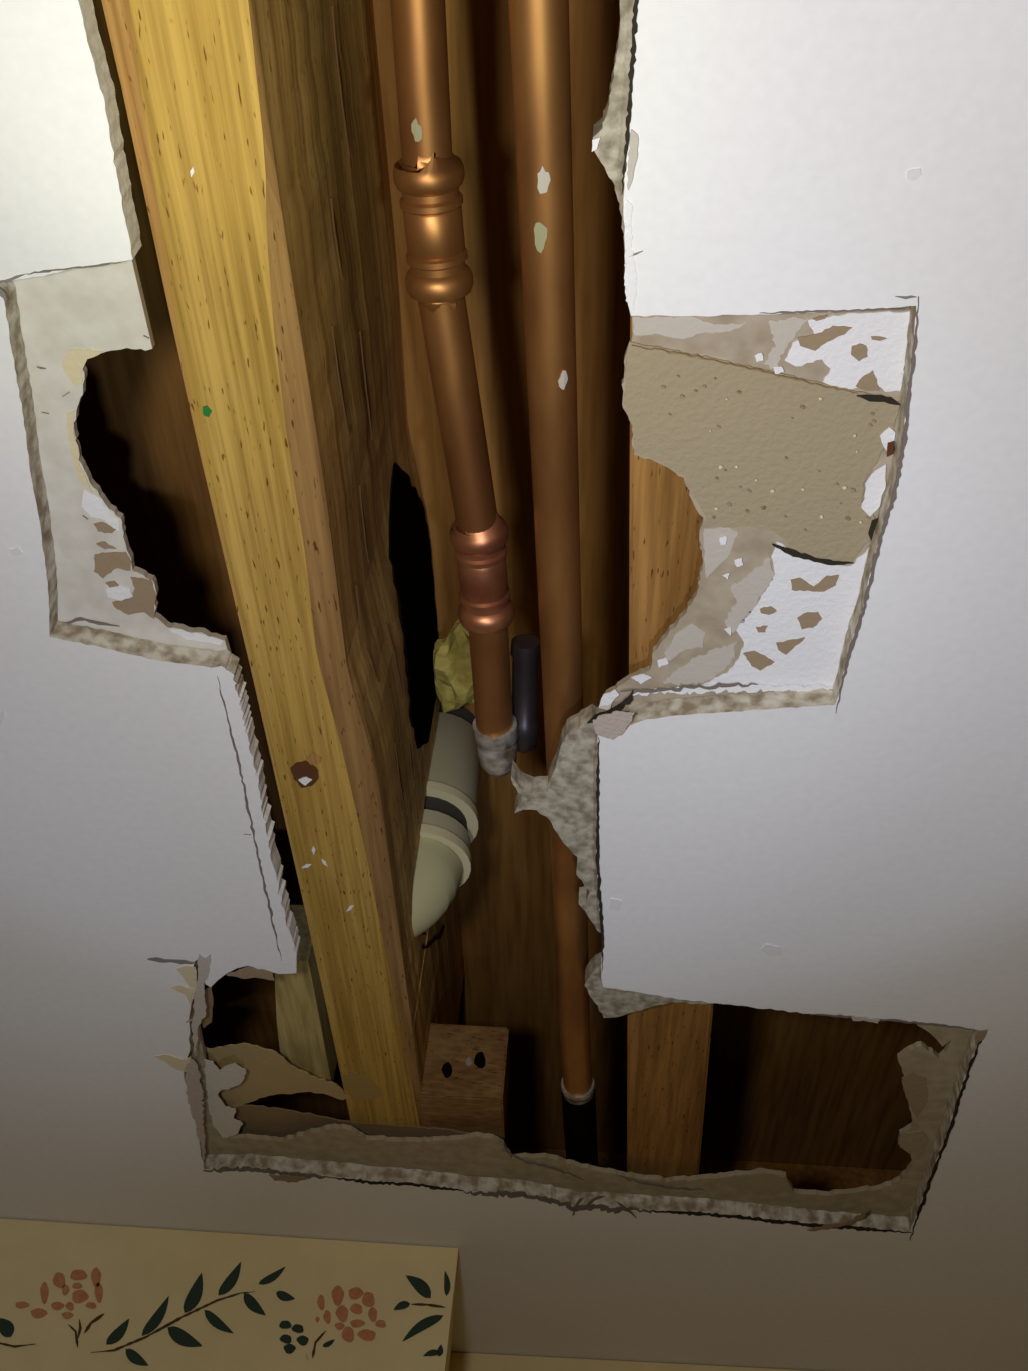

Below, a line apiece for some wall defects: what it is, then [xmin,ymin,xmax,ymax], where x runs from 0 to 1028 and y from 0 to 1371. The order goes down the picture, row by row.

peeling [624,129,638,310]
peeling [755,352,784,374]
peeling [861,427,895,516]
peeling [631,657,669,684]
spalling [593,689,635,740]
peeling [852,1015,880,1024]
spalling [154,954,211,1170]